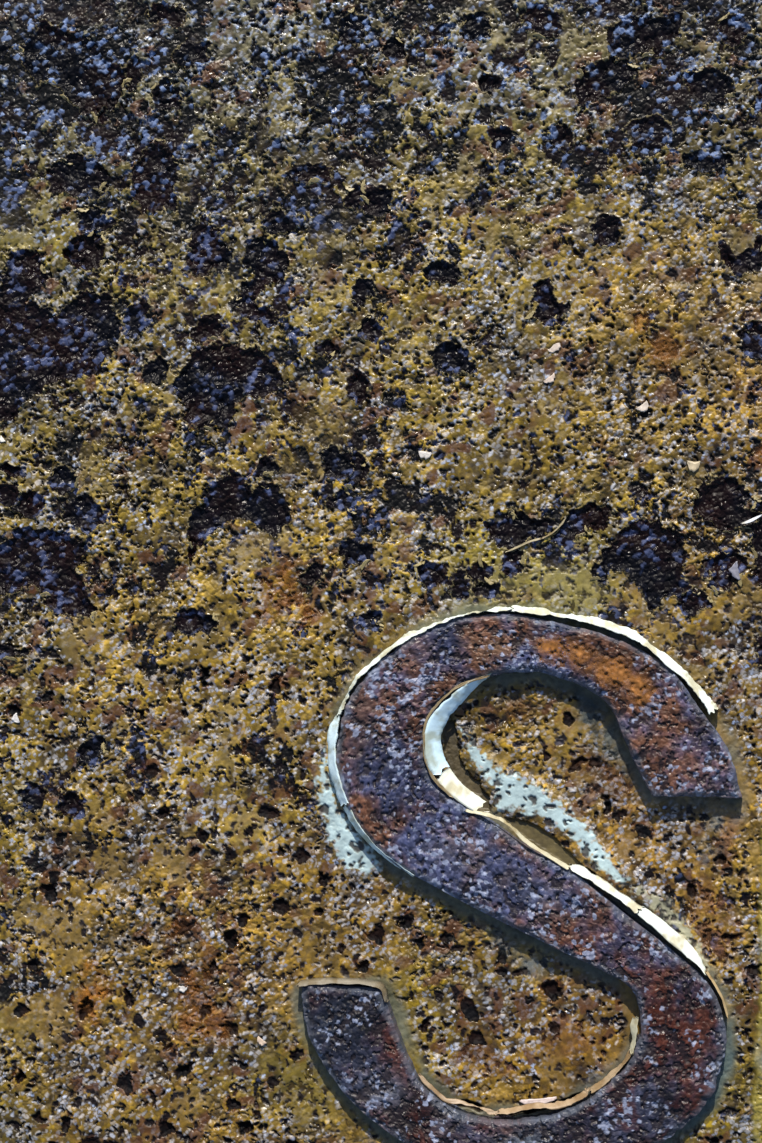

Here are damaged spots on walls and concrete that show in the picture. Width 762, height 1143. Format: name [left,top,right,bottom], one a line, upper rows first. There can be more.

rust [357,608,384,632]
rust [538,639,652,703]